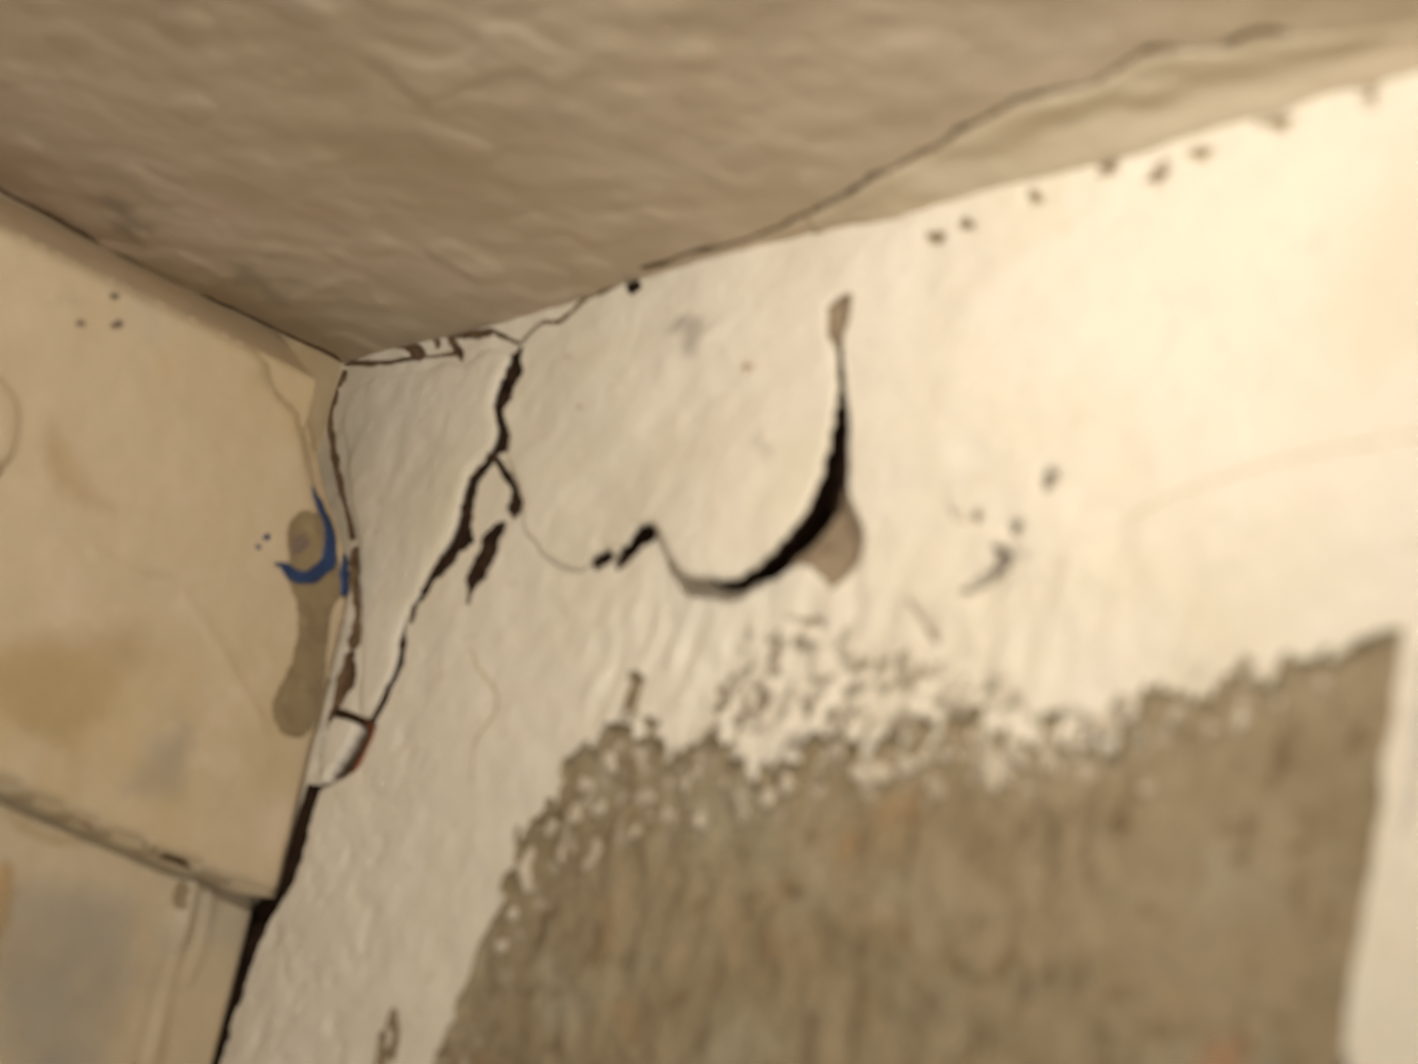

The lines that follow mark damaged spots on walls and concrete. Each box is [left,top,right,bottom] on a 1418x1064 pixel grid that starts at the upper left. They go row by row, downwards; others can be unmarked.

crack [0,188,126,258]
crack [207,46,1180,724]
crack [213,784,324,1064]